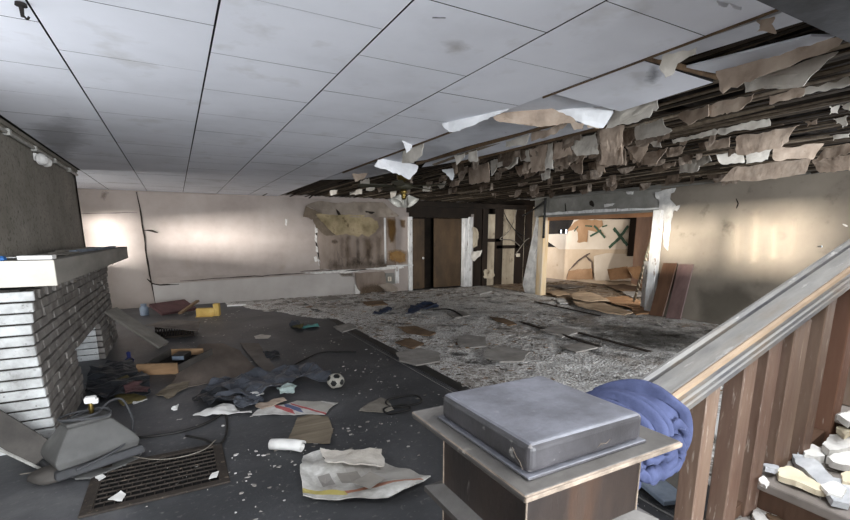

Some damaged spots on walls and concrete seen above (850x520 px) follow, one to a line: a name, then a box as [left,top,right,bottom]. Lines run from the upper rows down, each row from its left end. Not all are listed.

peeling [659,47,697,78]
peeling [678,37,850,125]
crack [121,192,404,301]
peeling [350,173,375,195]
flaking render [251,217,505,312]
peeling [374,141,424,179]
flaking render [546,188,680,250]
peeling [423,100,850,192]